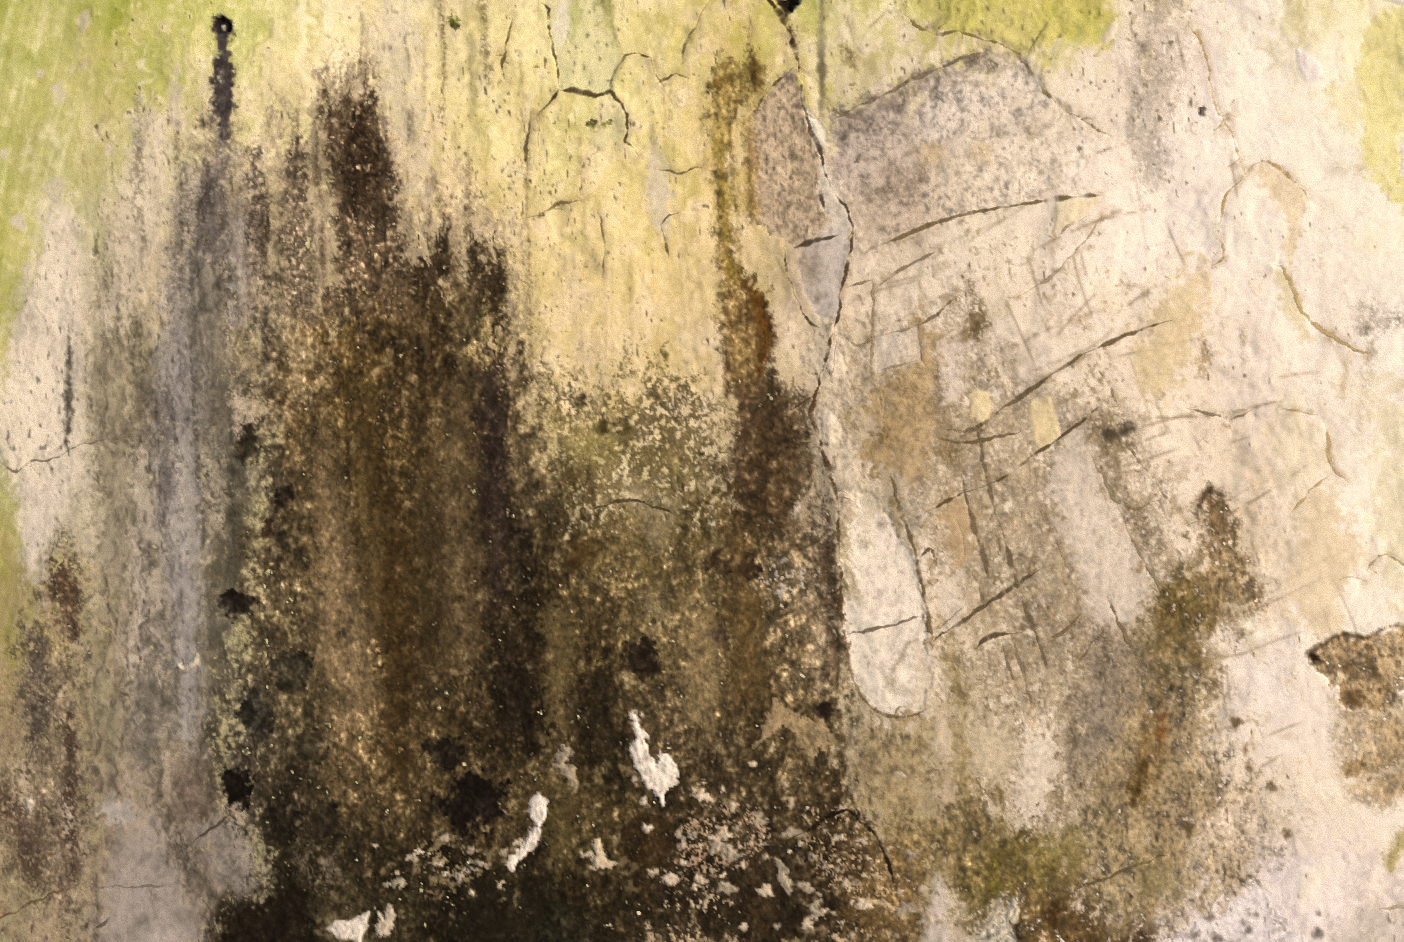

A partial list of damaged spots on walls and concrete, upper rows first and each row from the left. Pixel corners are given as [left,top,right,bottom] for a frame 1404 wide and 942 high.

water stain [434,0,462,130]
crack [501,25,512,69]
water stain [584,117,614,133]
crack [524,4,693,161]
crack [1193,31,1307,263]
crack [760,0,1052,718]
peeling [739,0,1119,834]
peeling [1027,393,1272,653]
crack [1296,431,1345,508]
crack [1281,265,1369,354]
spalling [1304,621,1404,804]
peeling [627,709,944,942]